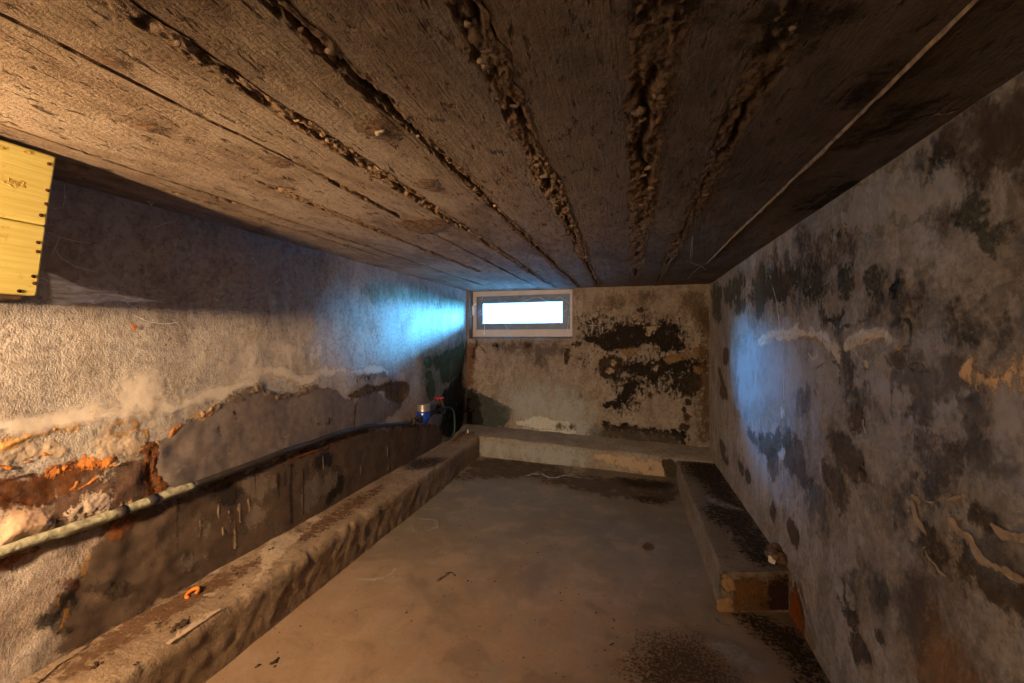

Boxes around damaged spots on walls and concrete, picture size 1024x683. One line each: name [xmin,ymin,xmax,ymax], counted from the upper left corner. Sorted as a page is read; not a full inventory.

spalling [169,382,318,438]
spalling [348,371,410,404]
damp [0,145,1024,666]
peeling [0,438,67,471]
rust [0,460,102,511]
peeling [91,429,168,496]